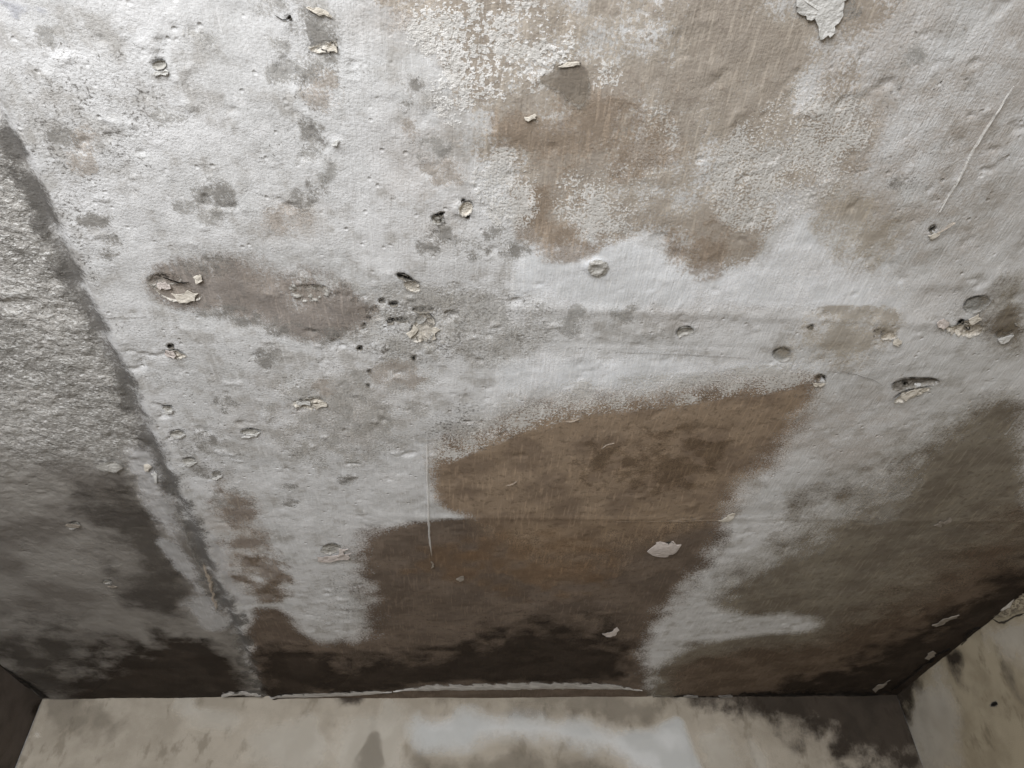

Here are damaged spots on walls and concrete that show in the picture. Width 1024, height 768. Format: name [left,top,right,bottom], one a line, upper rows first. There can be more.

peeling [796,0,846,40]
water stain [43,126,97,175]
water stain [379,0,903,269]
water stain [171,182,235,226]
water stain [76,212,122,260]
spalling [146,273,202,303]
water stain [147,254,376,368]
spalling [350,297,440,343]
spalling [937,314,985,338]
spalling [892,377,940,403]
water stain [0,364,1024,768]
peeling [647,541,681,557]